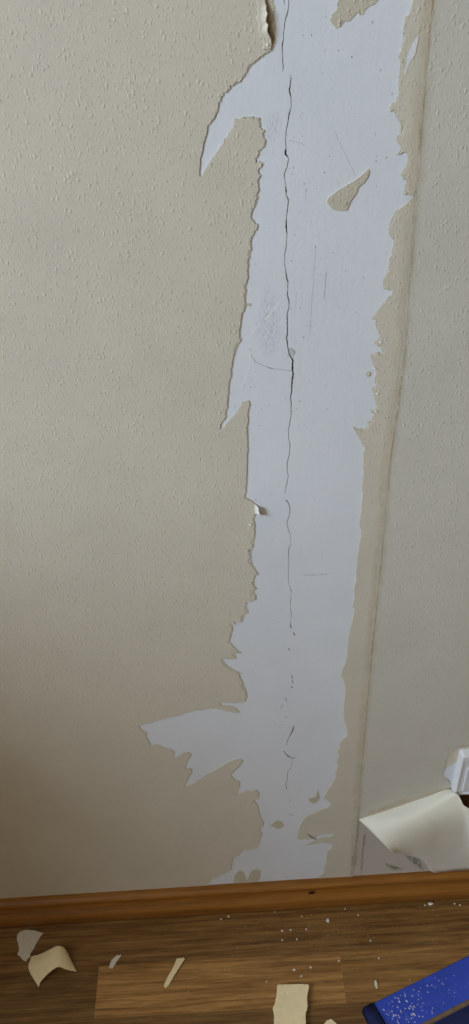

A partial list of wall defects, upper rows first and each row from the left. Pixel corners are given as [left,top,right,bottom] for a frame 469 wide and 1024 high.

crack [251,0,295,650]
peeling [139,0,414,885]
peeling [353,763,469,876]